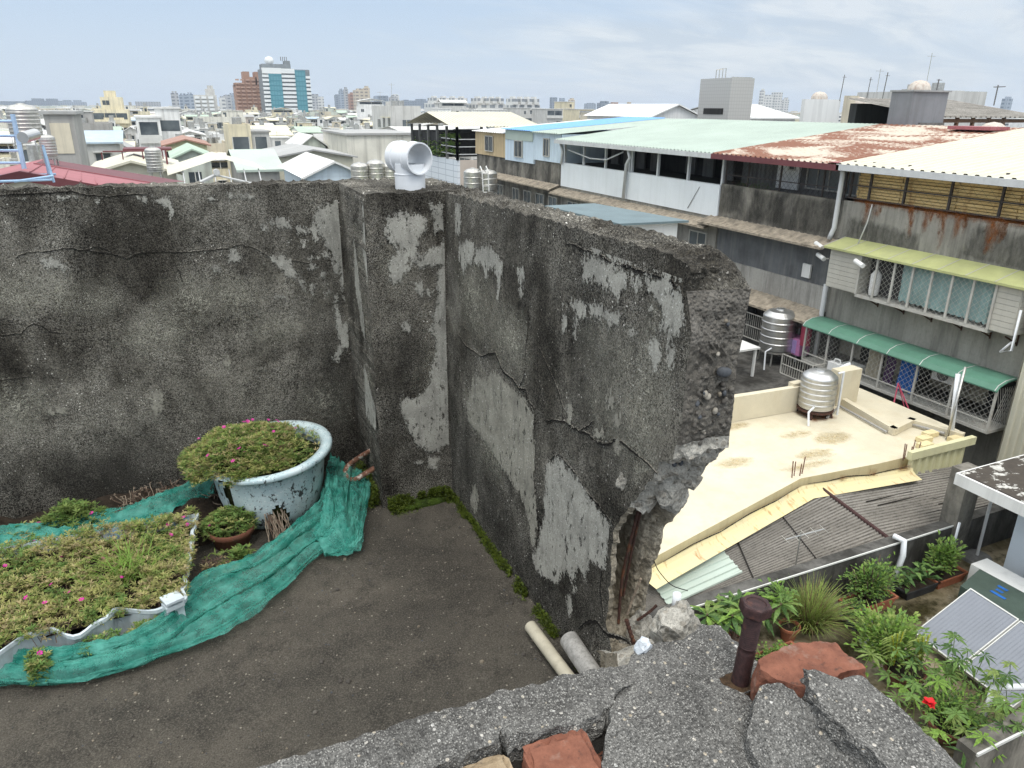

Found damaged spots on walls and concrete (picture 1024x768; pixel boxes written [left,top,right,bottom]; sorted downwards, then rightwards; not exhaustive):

crack [14,243,317,282]
peeling [260,200,368,363]
peeling [363,363,376,431]
peeling [384,202,503,471]
peeling [466,371,612,618]
crack [457,314,658,474]
peeling [592,385,624,457]
peeling [561,247,687,377]
spalling [615,349,734,651]